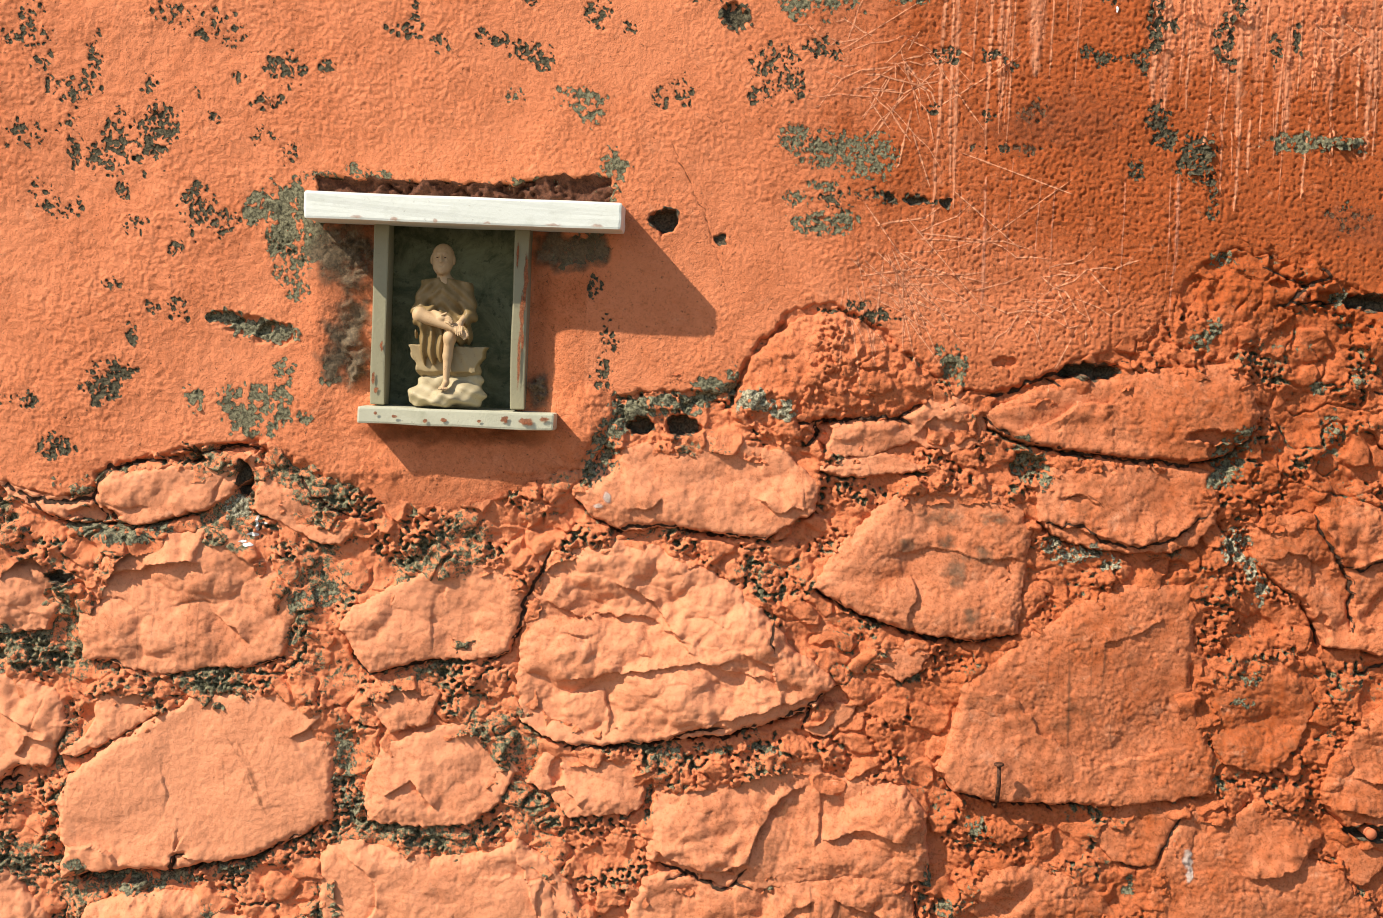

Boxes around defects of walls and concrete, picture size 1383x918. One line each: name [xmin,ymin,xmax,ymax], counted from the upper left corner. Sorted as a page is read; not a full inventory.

peeling [747,0,867,106]
damp [1149,0,1383,211]
spalling [167,49,634,303]
peeling [777,122,938,238]
damp [309,216,374,383]
damp [535,224,610,271]
peeling [77,357,140,411]
peeling [145,296,314,439]
damp [504,430,527,442]
damp [527,375,548,407]
peeling [581,313,798,487]
peeling [62,858,258,897]